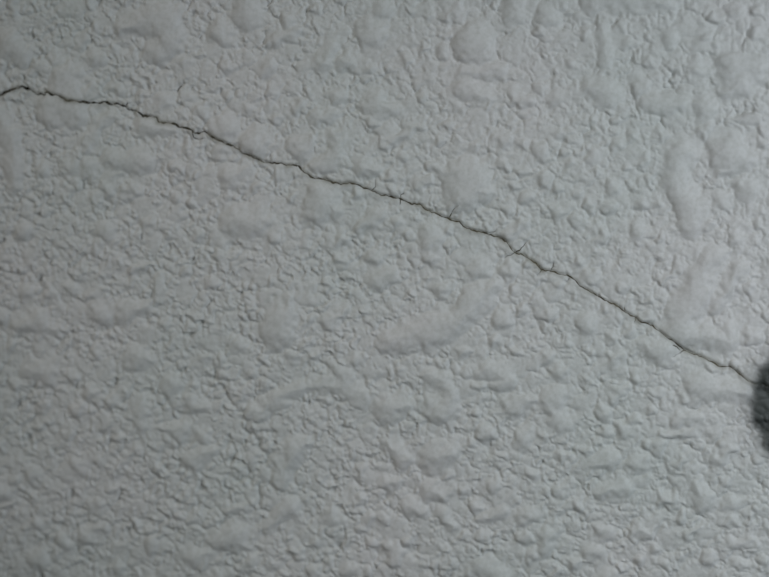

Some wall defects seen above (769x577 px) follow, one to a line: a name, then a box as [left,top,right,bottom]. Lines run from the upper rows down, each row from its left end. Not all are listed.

crack [0,85,748,381]